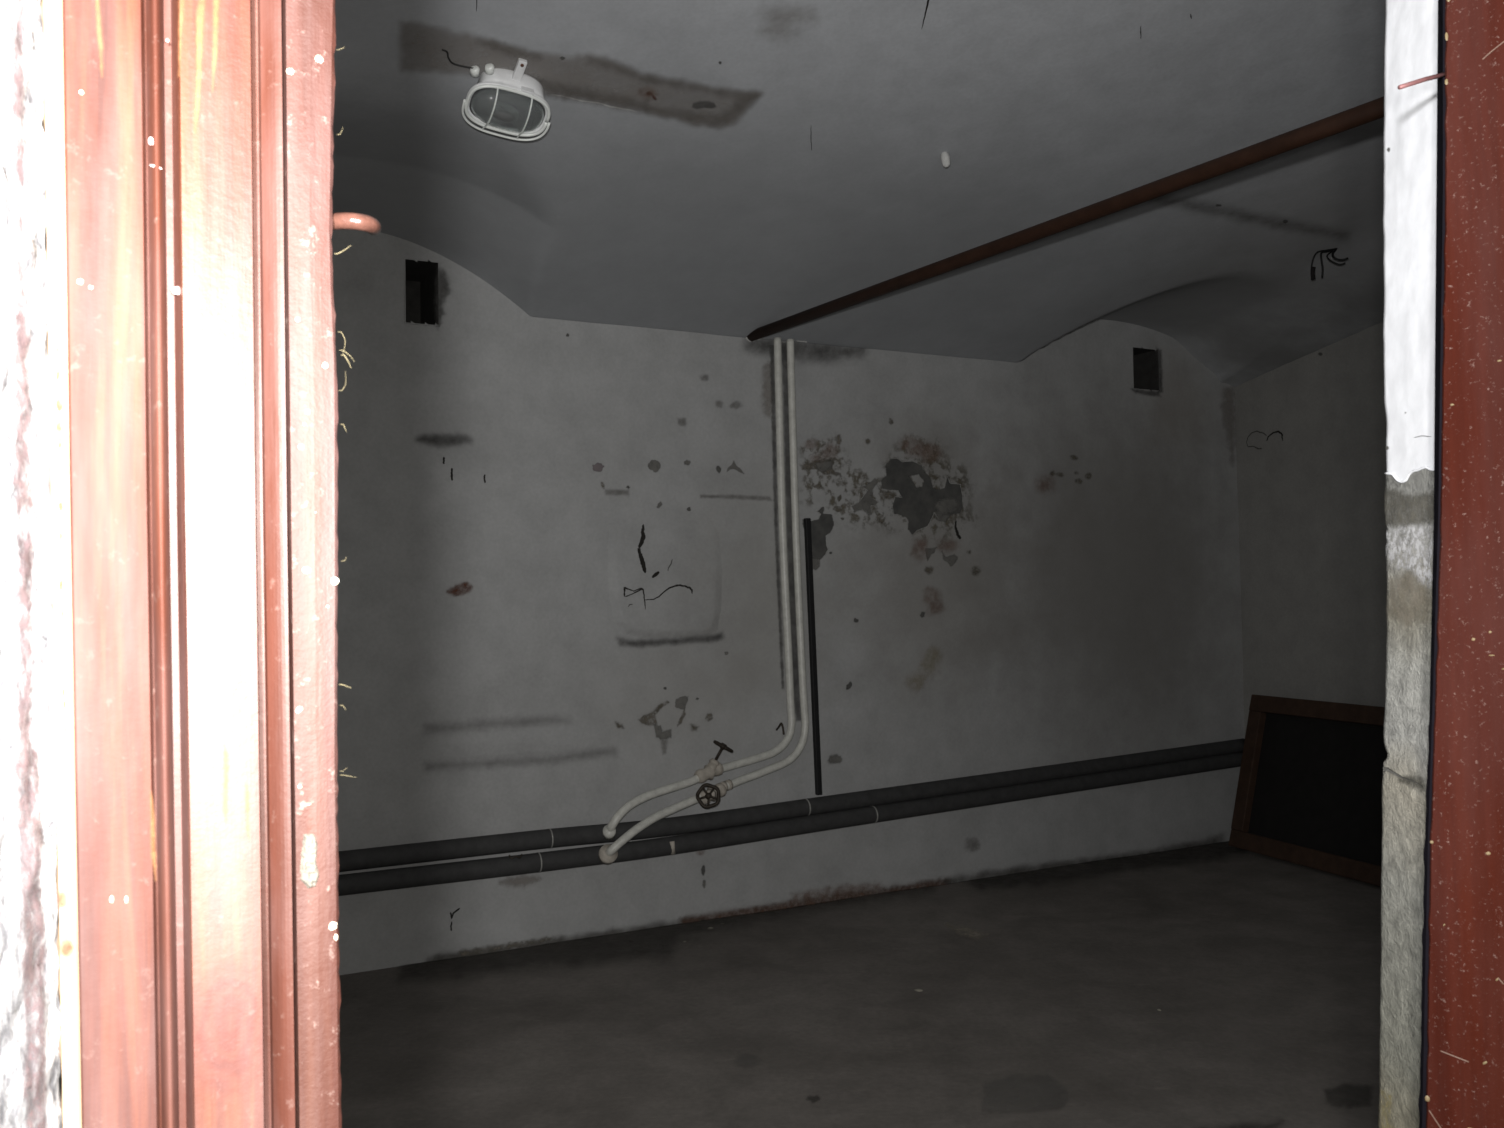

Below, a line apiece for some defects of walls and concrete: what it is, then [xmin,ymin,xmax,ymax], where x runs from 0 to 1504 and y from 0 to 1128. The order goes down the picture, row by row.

leakage [404,26,757,125]
peeling [802,435,841,488]
peeling [803,458,963,570]
peeling [640,687,712,749]